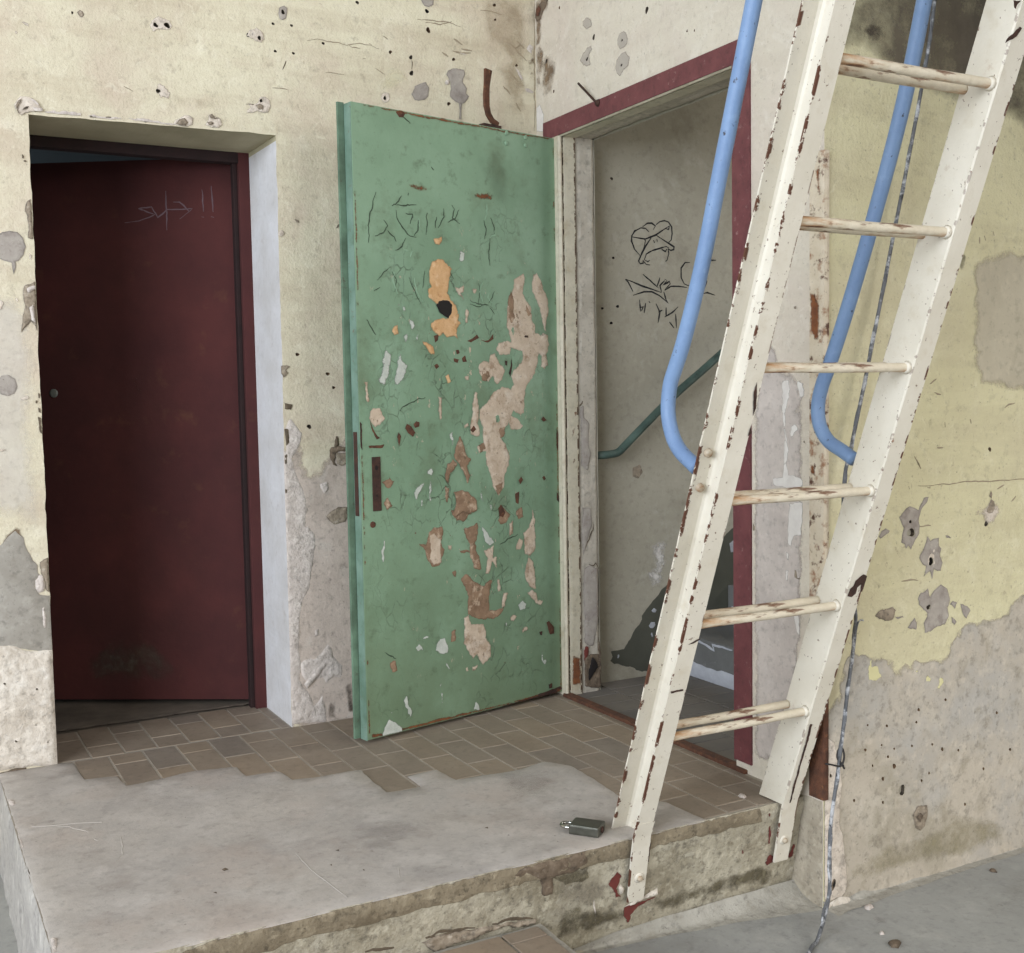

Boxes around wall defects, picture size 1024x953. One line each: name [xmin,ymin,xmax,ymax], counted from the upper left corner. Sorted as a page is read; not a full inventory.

water stain [530,0,547,68]
peeling [412,82,429,101]
peeling [445,68,469,119]
rust [810,295,819,339]
flaking render [975,253,1024,389]
peeling [0,282,37,507]
crack [927,479,1018,488]
spalling [40,558,50,593]
flaking render [284,403,353,726]
flaking render [788,497,1024,907]